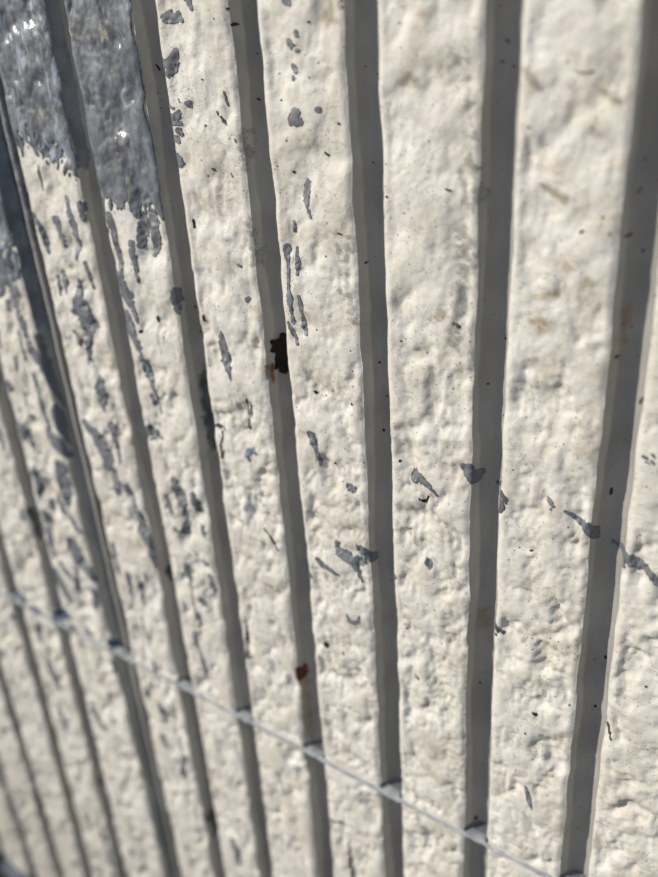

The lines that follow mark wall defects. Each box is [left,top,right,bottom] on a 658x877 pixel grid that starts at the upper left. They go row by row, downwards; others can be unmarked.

peeling [160,0,194,24]
peeling [156,47,180,78]
peeling [287,107,304,127]
peeling [303,178,312,219]
peeling [32,195,99,366]
peeling [105,207,162,414]
peeling [283,243,317,346]
peeling [0,256,99,635]
peeling [411,467,438,497]
peeling [459,463,486,484]
peeling [81,375,157,675]
peeling [334,540,379,582]